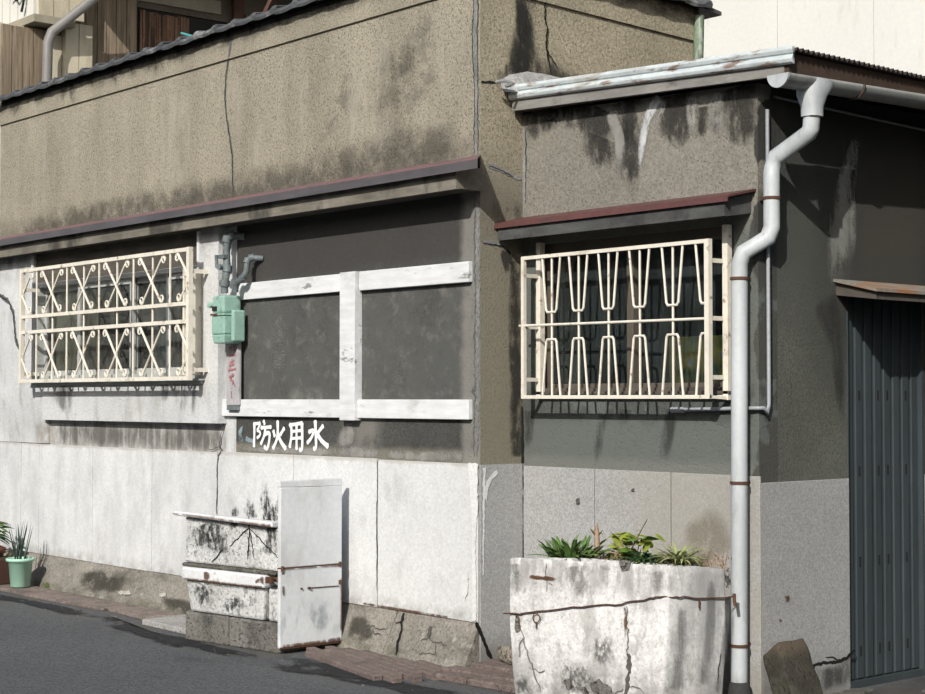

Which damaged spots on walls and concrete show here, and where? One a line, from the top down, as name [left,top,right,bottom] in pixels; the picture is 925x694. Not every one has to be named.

water stain [504,0,567,77]
crack [544,3,558,68]
crack [224,39,233,198]
water stain [527,82,757,181]
crack [0,294,19,350]
crack [209,423,224,515]
water stain [195,508,237,552]
water stain [247,492,277,553]
crack [365,613,448,656]